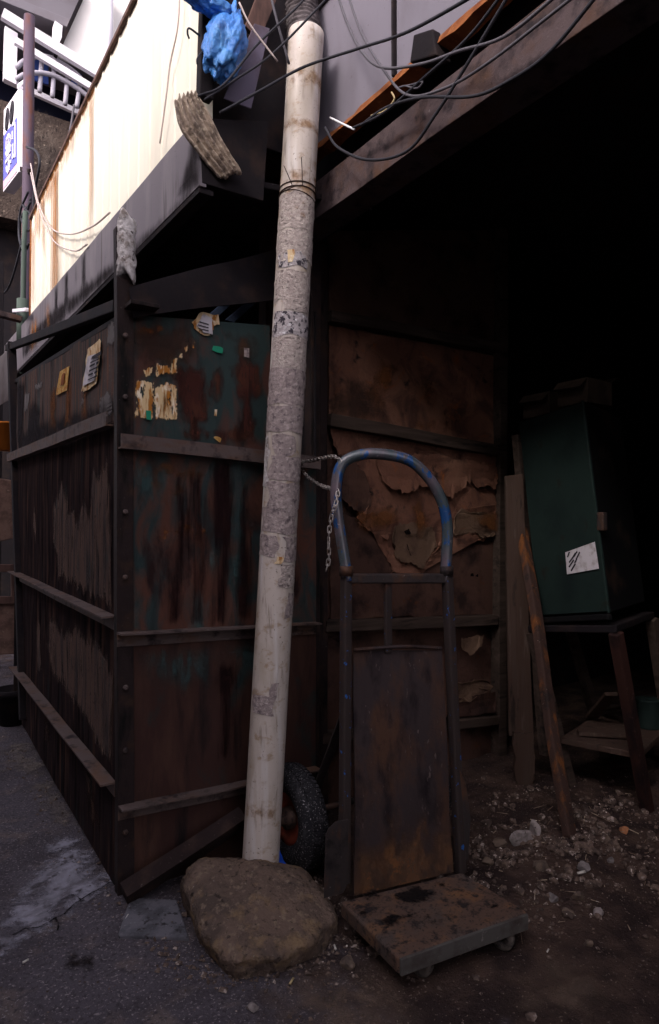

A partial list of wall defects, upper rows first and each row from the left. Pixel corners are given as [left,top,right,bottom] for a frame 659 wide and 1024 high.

rust [32,172,57,289]
rust [134,326,262,441]
rust [214,463,250,624]
peeling [330,428,498,573]